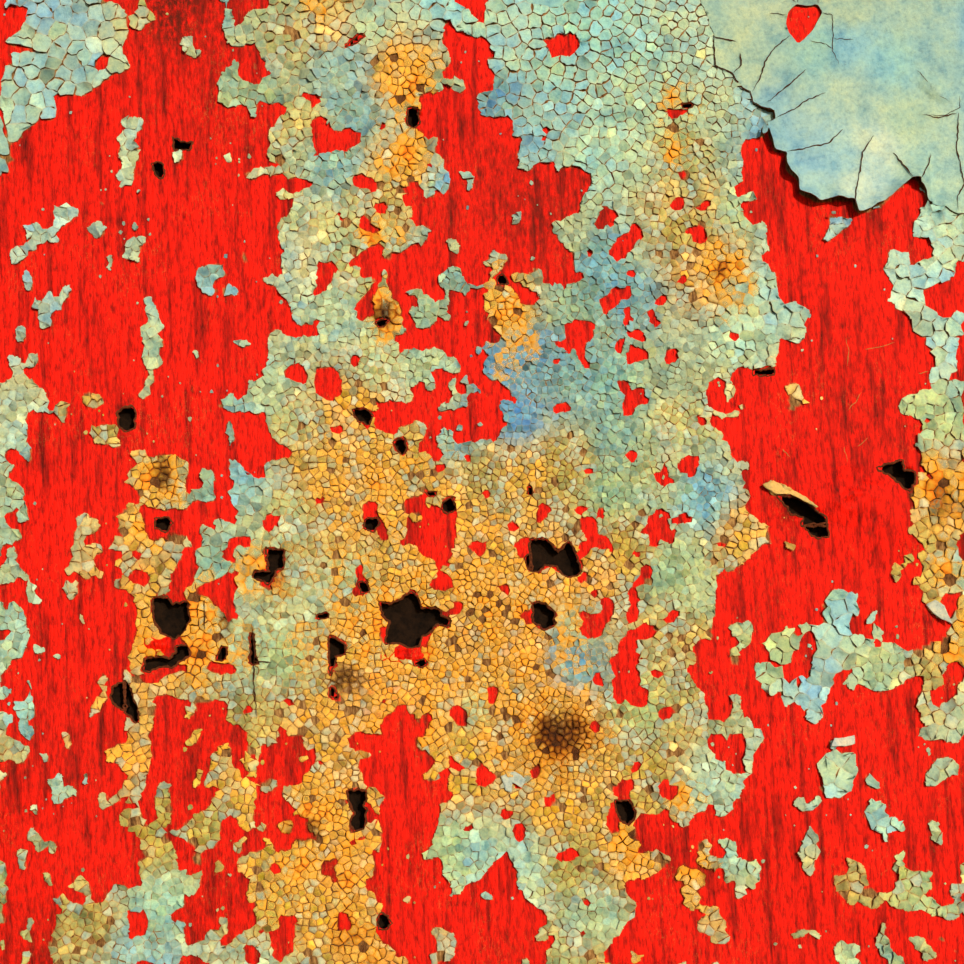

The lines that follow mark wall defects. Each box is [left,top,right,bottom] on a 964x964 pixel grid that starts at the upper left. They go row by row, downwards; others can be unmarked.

peeling [0,0,155,142]
crack [713,0,824,121]
crack [812,13,850,63]
crack [790,129,843,151]
crack [855,136,873,210]
crack [894,153,931,178]
crack [918,71,964,214]
peeling [9,202,79,329]
peeling [47,0,811,964]
peeling [793,740,905,842]
peeling [925,757,959,786]
peeling [798,826,821,876]